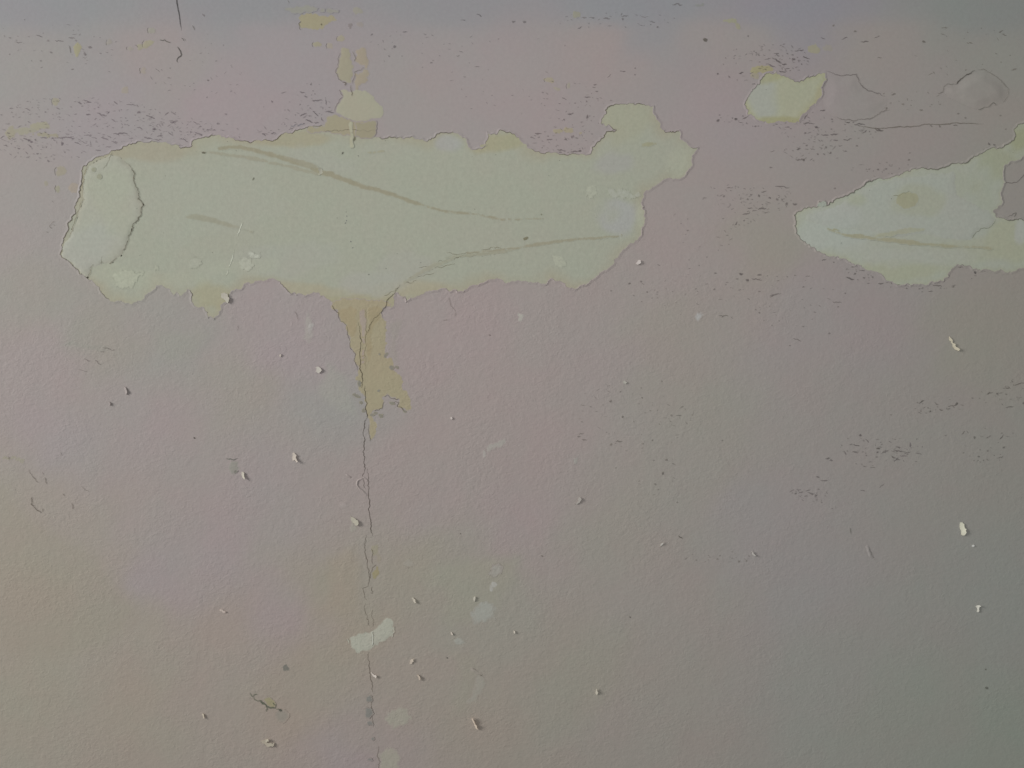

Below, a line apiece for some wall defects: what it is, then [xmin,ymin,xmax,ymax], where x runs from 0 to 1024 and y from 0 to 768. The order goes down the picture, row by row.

peeling [735,50,833,134]
peeling [58,92,699,320]
peeling [735,120,1024,292]
crack [345,285,400,633]
crack [365,661,380,763]